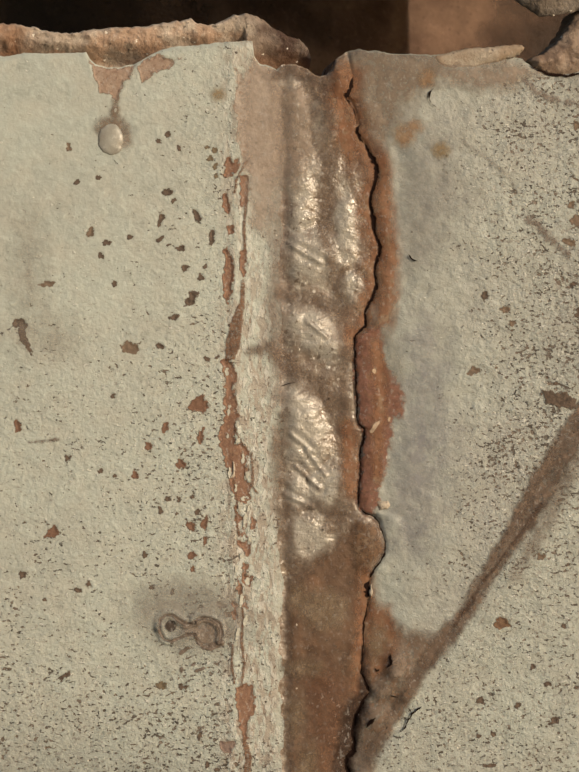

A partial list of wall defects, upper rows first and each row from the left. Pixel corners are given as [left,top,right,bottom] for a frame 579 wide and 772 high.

peeling [89,54,174,101]
peeling [435,45,524,68]
peeling [156,212,185,252]
peeling [185,291,200,306]
peeling [222,248,247,305]
peeling [12,318,33,355]
peeling [120,340,139,354]
peeling [188,395,209,414]
rust [159,0,579,772]
crack [334,78,422,772]
peeling [204,355,257,640]
peeling [219,683,257,754]